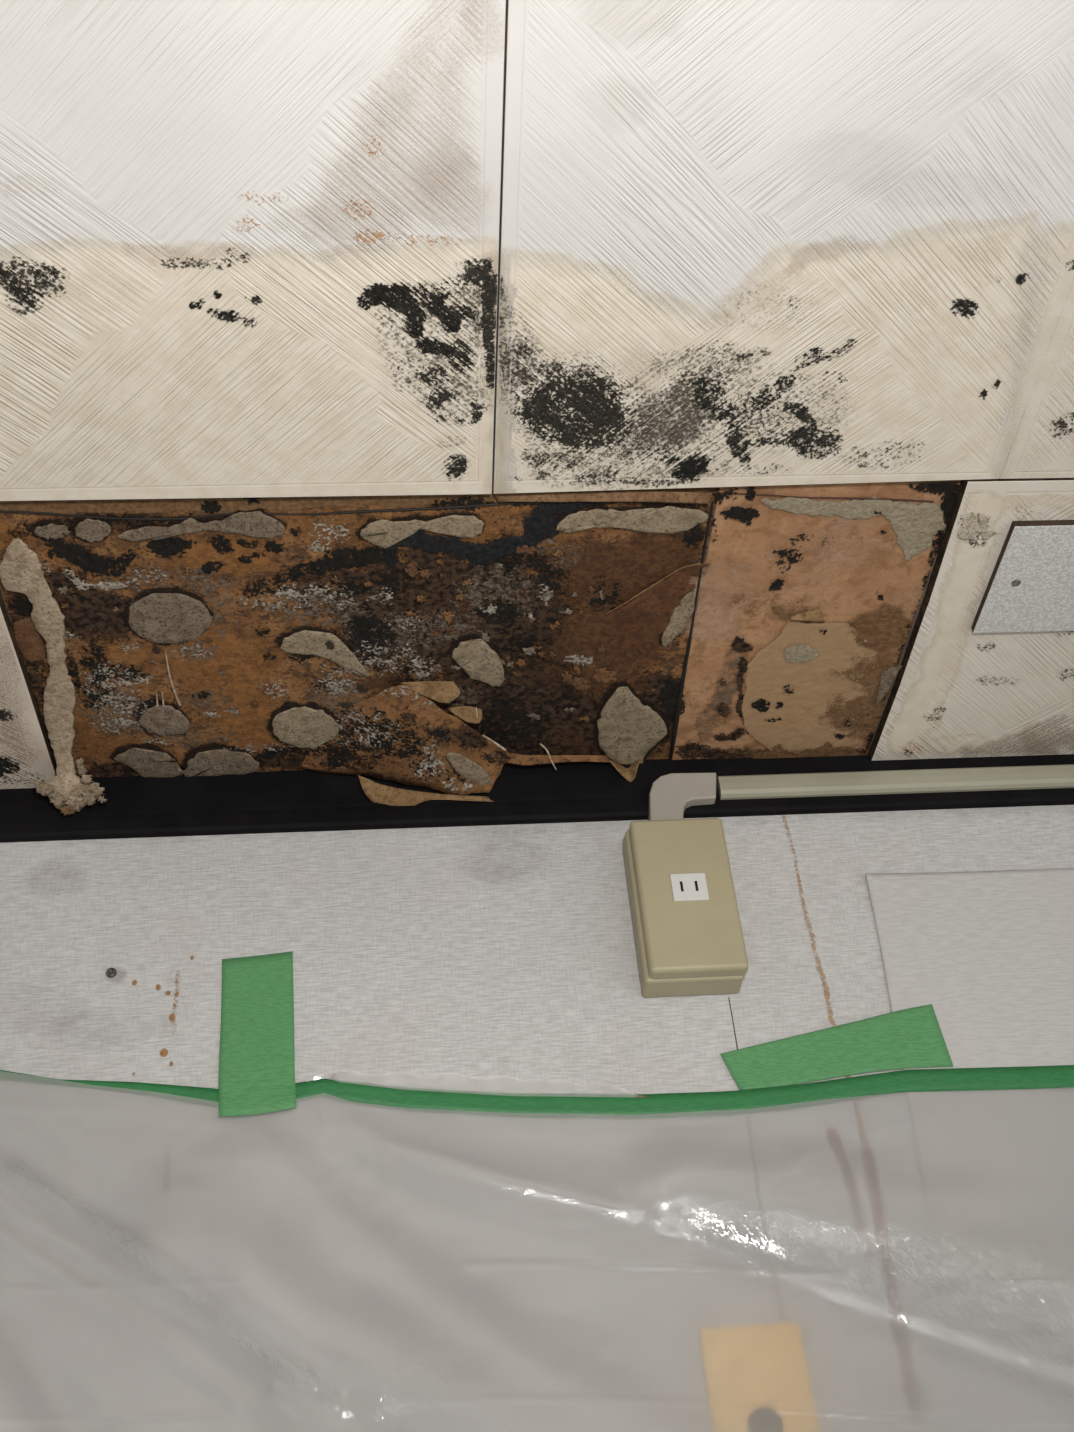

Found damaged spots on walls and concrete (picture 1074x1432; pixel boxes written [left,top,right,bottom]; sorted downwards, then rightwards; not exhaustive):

leakage [0,197,1074,793]
peeling [542,586,604,630]
spalling [0,538,107,816]
peeling [505,646,557,676]
rust [156,975,179,1023]